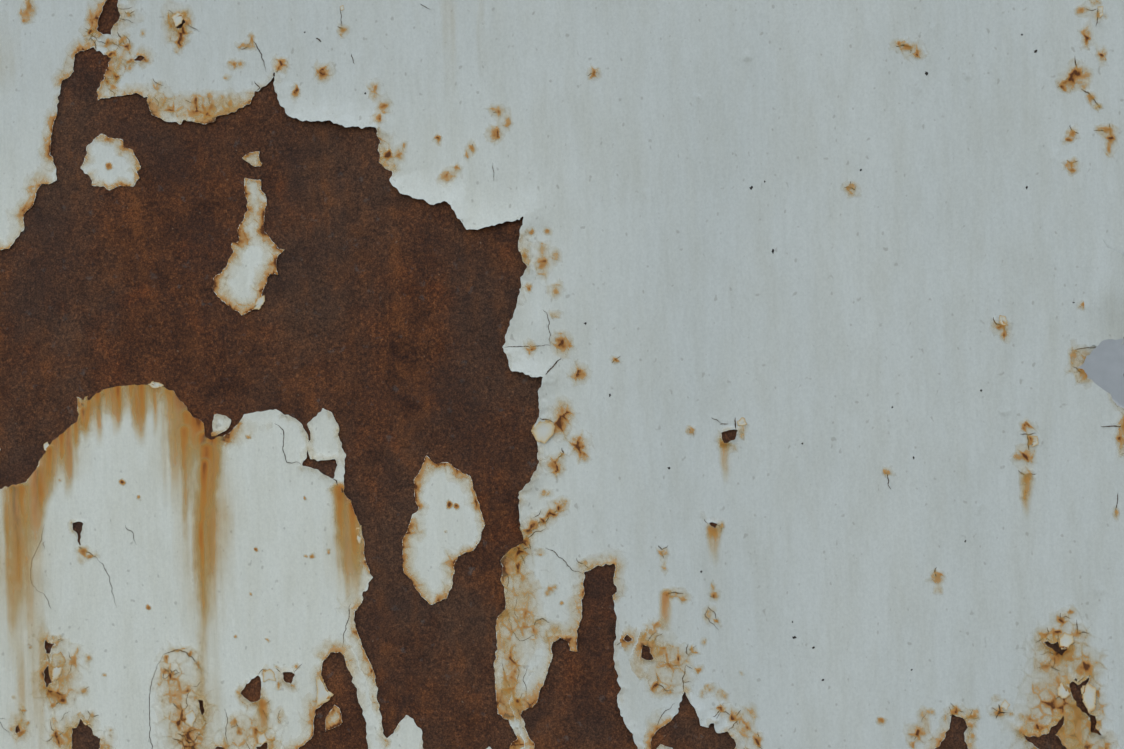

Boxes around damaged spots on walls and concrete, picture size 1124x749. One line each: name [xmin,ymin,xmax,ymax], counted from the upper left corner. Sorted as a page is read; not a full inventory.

corrosion [1077,1,1106,60]
corrosion [153,79,233,119]
corrosion [491,107,511,140]
corrosion [1057,60,1090,91]
corrosion [1094,123,1115,152]
peeling [0,0,762,749]
corrosion [553,333,572,352]
peeling [1070,238,1124,449]
crack [30,524,51,608]
corrosion [4,384,219,607]
corrosion [328,483,359,574]
corrosion [1013,421,1039,499]